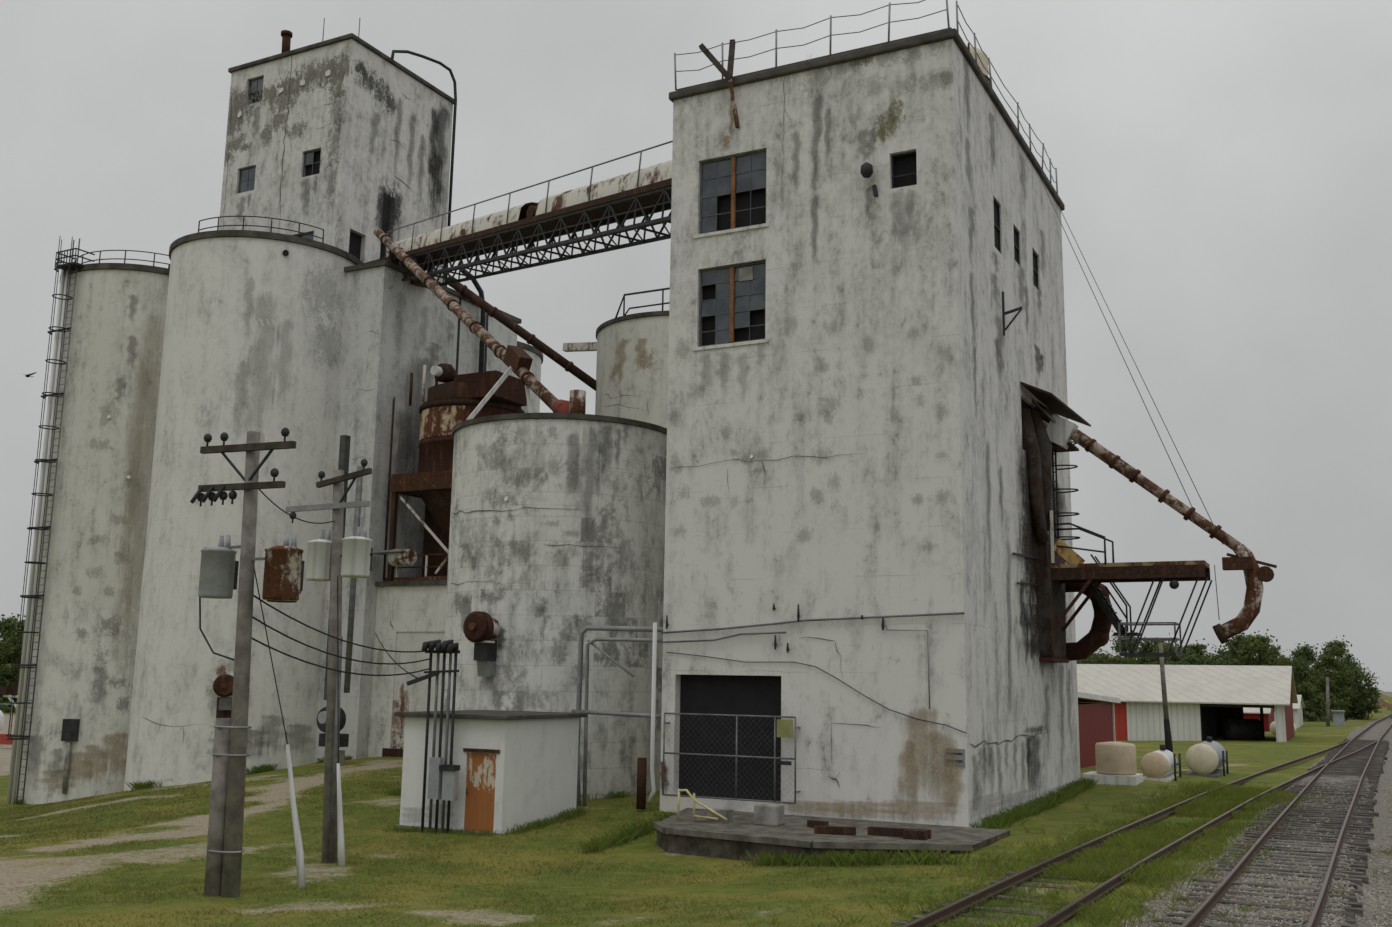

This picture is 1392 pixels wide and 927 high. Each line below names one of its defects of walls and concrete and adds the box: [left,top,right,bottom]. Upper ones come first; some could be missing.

damp [429,109,448,209]
damp [378,185,401,236]
damp [1019,441,1065,668]